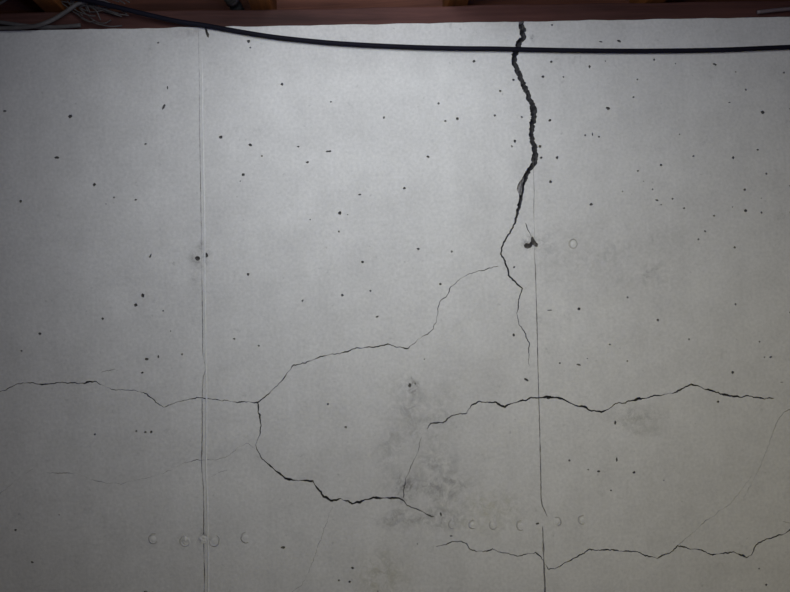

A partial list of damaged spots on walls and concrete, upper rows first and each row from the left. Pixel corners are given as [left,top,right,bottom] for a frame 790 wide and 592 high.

crack [0,21,538,570]
crack [427,383,774,429]
crack [436,409,790,570]